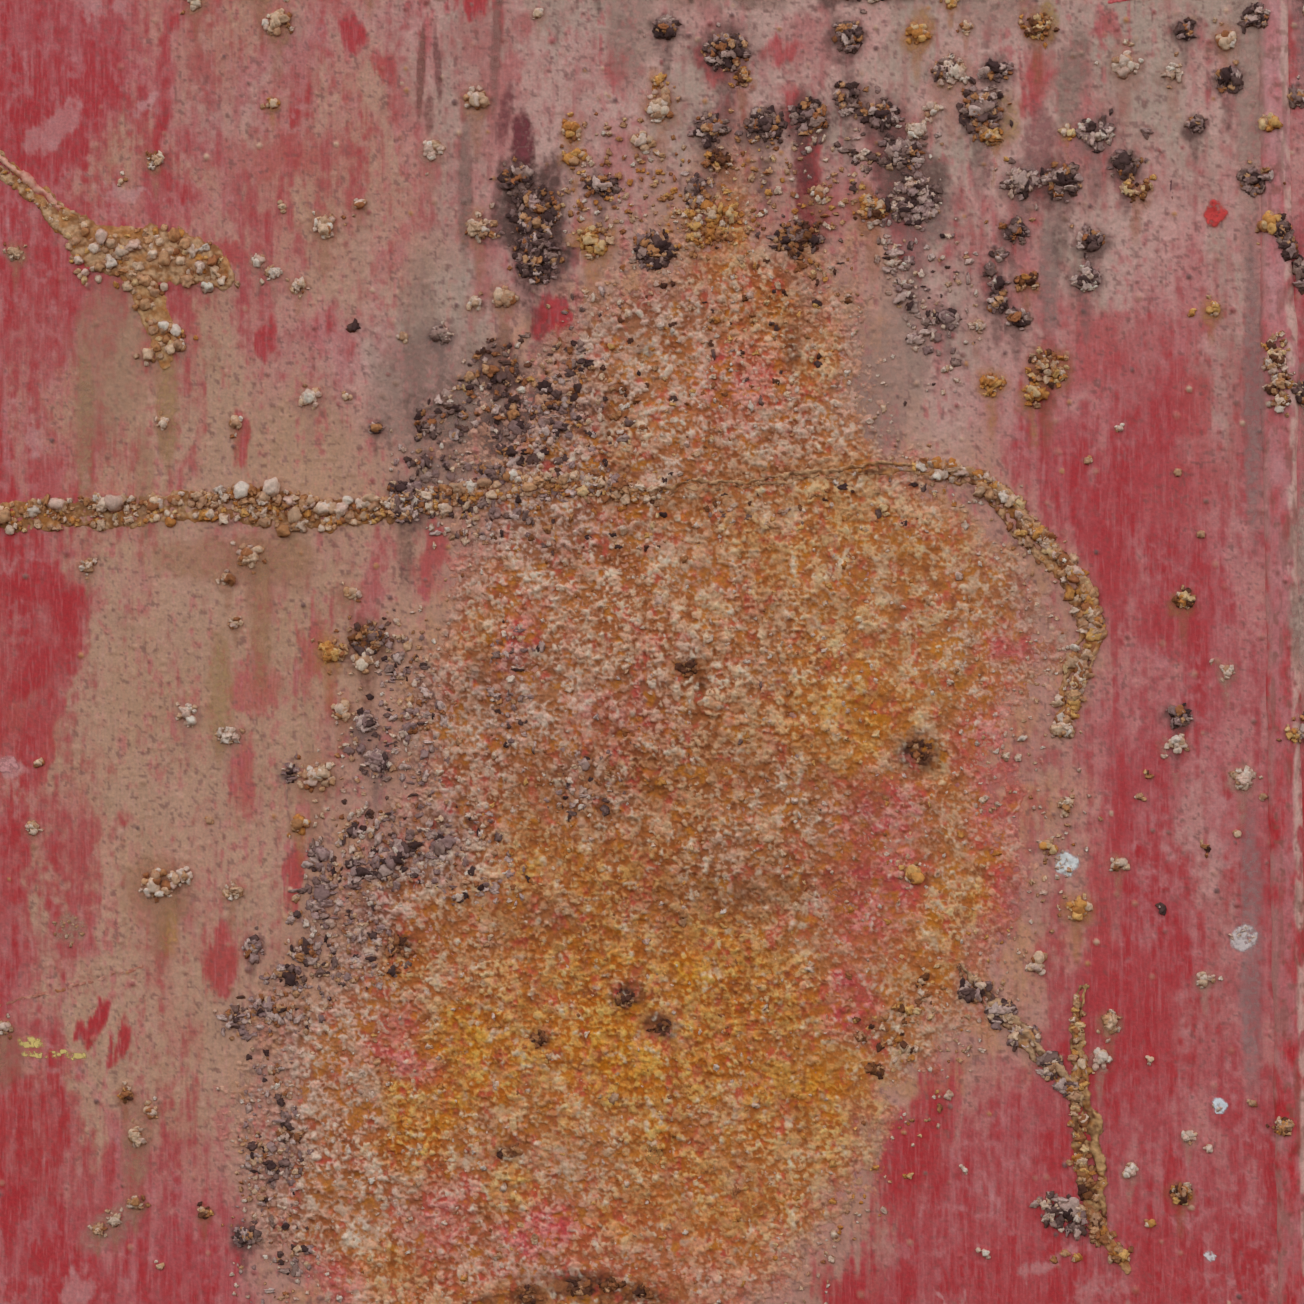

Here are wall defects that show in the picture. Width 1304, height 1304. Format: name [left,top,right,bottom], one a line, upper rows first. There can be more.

corrosion [643,14,682,51]
corrosion [700,22,753,89]
corrosion [827,0,884,58]
corrosion [1160,17,1197,89]
corrosion [1213,2,1271,94]
corrosion [1058,108,1157,203]
corrosion [1182,114,1208,140]
corrosion [1236,160,1286,198]
corrosion [1255,210,1304,295]
corrosion [1261,330,1304,418]
corrosion [197,53,1106,1304]
corrosion [1085,1009,1122,1076]